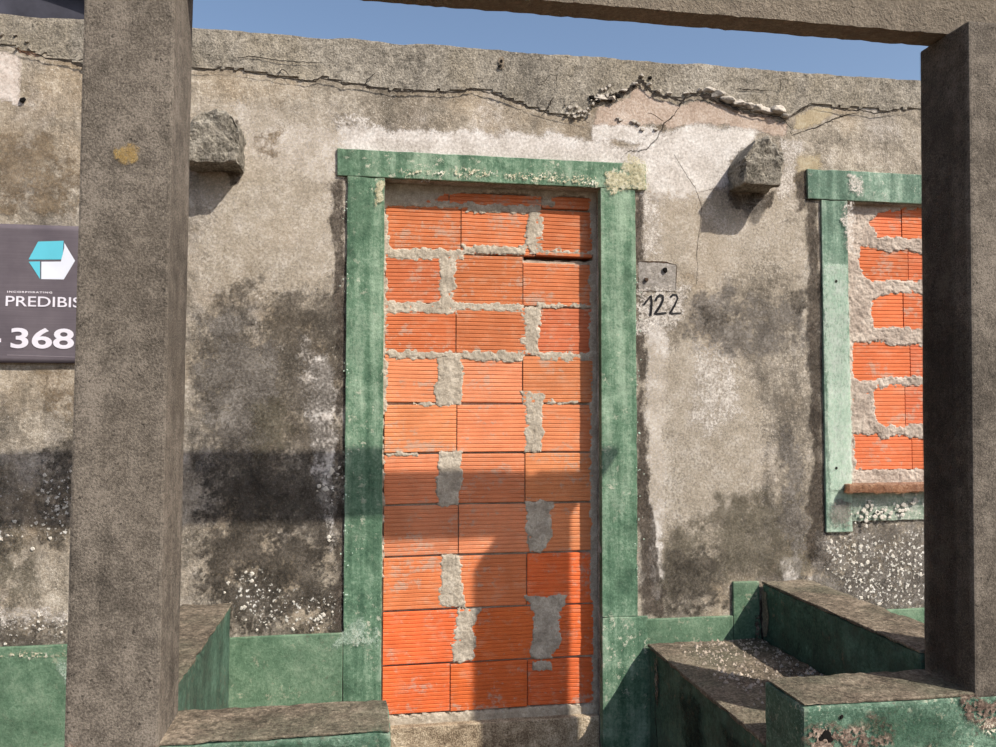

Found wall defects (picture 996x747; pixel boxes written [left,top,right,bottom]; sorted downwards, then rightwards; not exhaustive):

crack [0,32,83,68]
water stain [0,132,80,217]
peeling [375,180,385,205]
crack [192,56,912,159]
flaking render [404,87,787,195]
water stain [190,98,924,634]
water stain [34,440,73,557]
water stain [0,516,68,678]
peeling [804,714,895,747]
peeling [961,694,996,735]